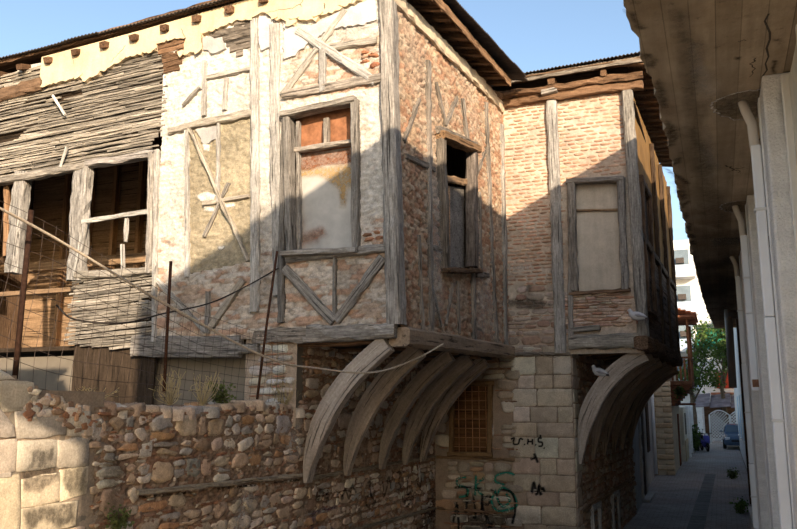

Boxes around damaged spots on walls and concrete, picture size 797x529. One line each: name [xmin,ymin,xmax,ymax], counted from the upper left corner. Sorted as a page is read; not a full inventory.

spalling [360,50,380,68]
crack [750,14,771,96]
spalling [362,230,383,245]